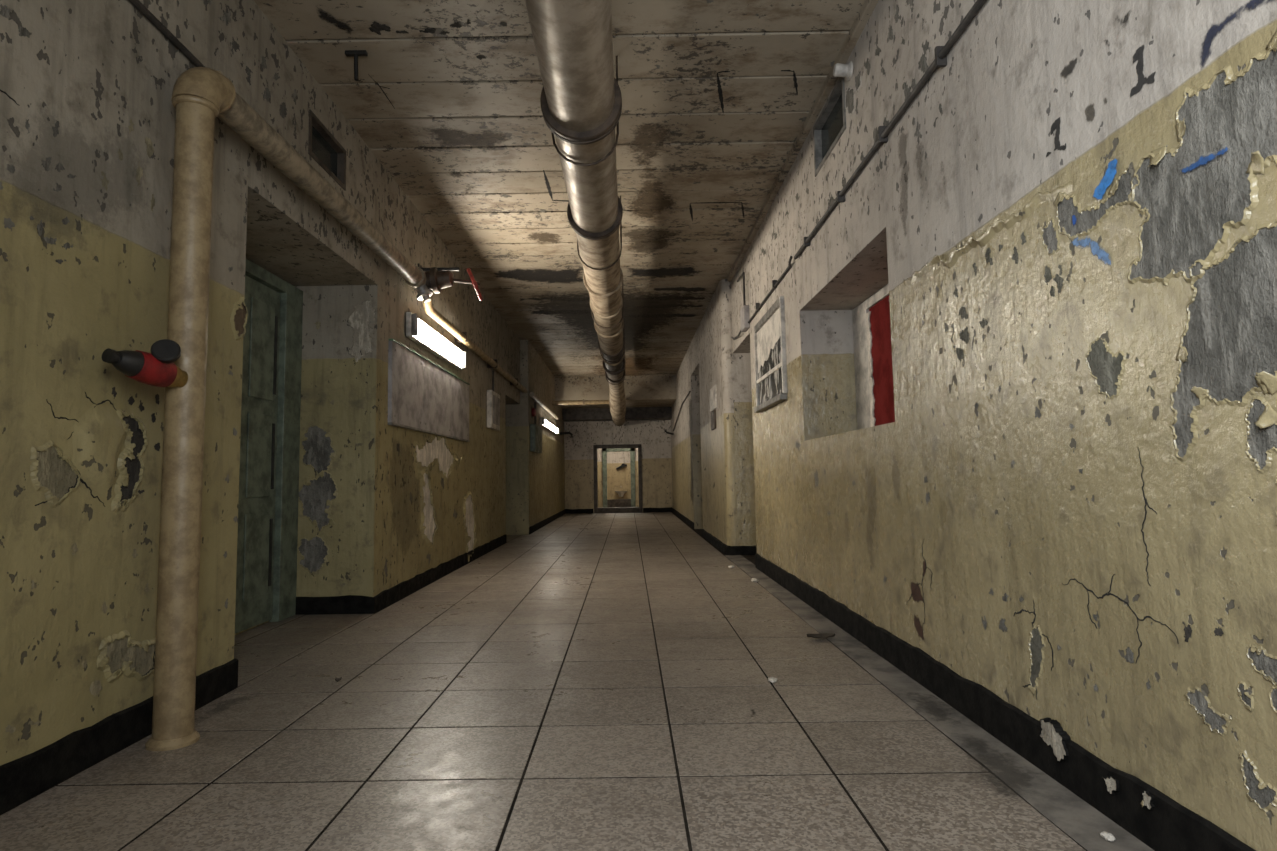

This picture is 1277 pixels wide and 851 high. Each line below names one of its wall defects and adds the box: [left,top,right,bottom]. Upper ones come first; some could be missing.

peeling [902,30,1277,485]
peeling [396,435,461,564]
peeling [453,491,477,562]
crack [1062,449,1178,663]
flaking render [1027,625,1062,695]
flaking render [1040,717,1071,762]
peeling [1185,686,1232,737]
peeling [1237,681,1254,711]
peeling [1246,644,1277,713]
peeling [1239,750,1277,817]